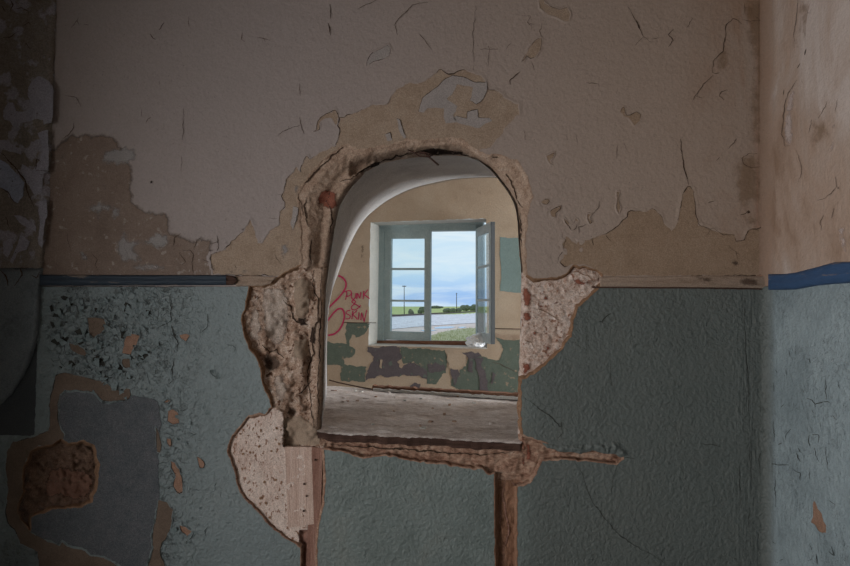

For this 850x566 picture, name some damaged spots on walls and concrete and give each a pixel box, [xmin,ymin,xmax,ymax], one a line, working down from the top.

crack [628,7,693,47]
crack [693,5,760,100]
peeling [42,65,762,566]
peeling [0,290,194,566]
peeling [809,499,828,536]